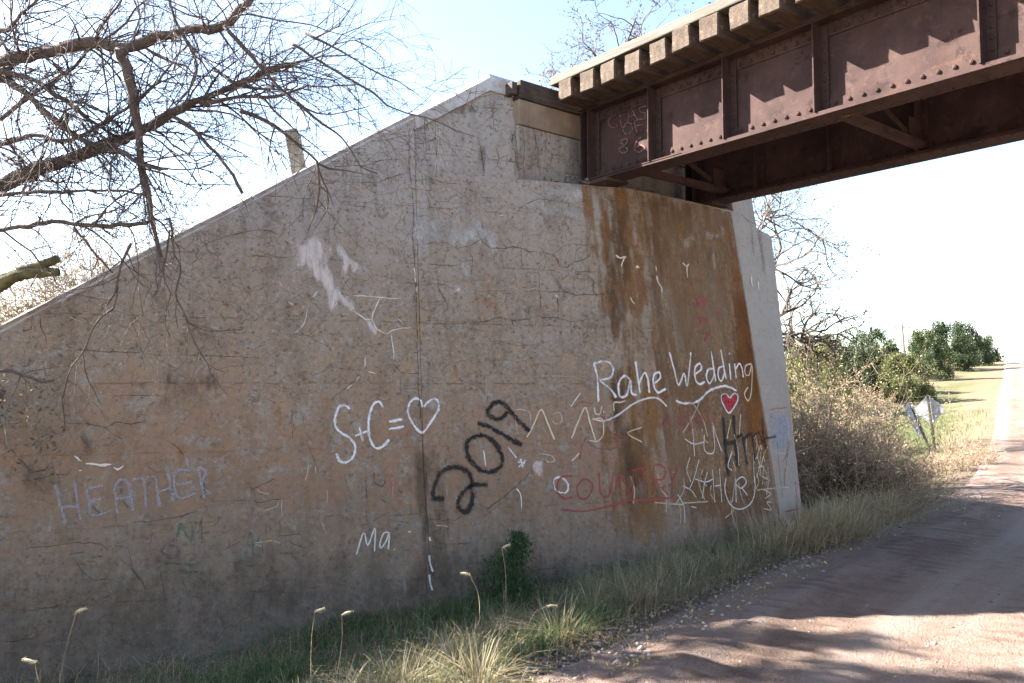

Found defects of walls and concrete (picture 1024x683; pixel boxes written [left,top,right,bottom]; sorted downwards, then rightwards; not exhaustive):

crack [281,95,618,581]
rust [582,186,769,533]